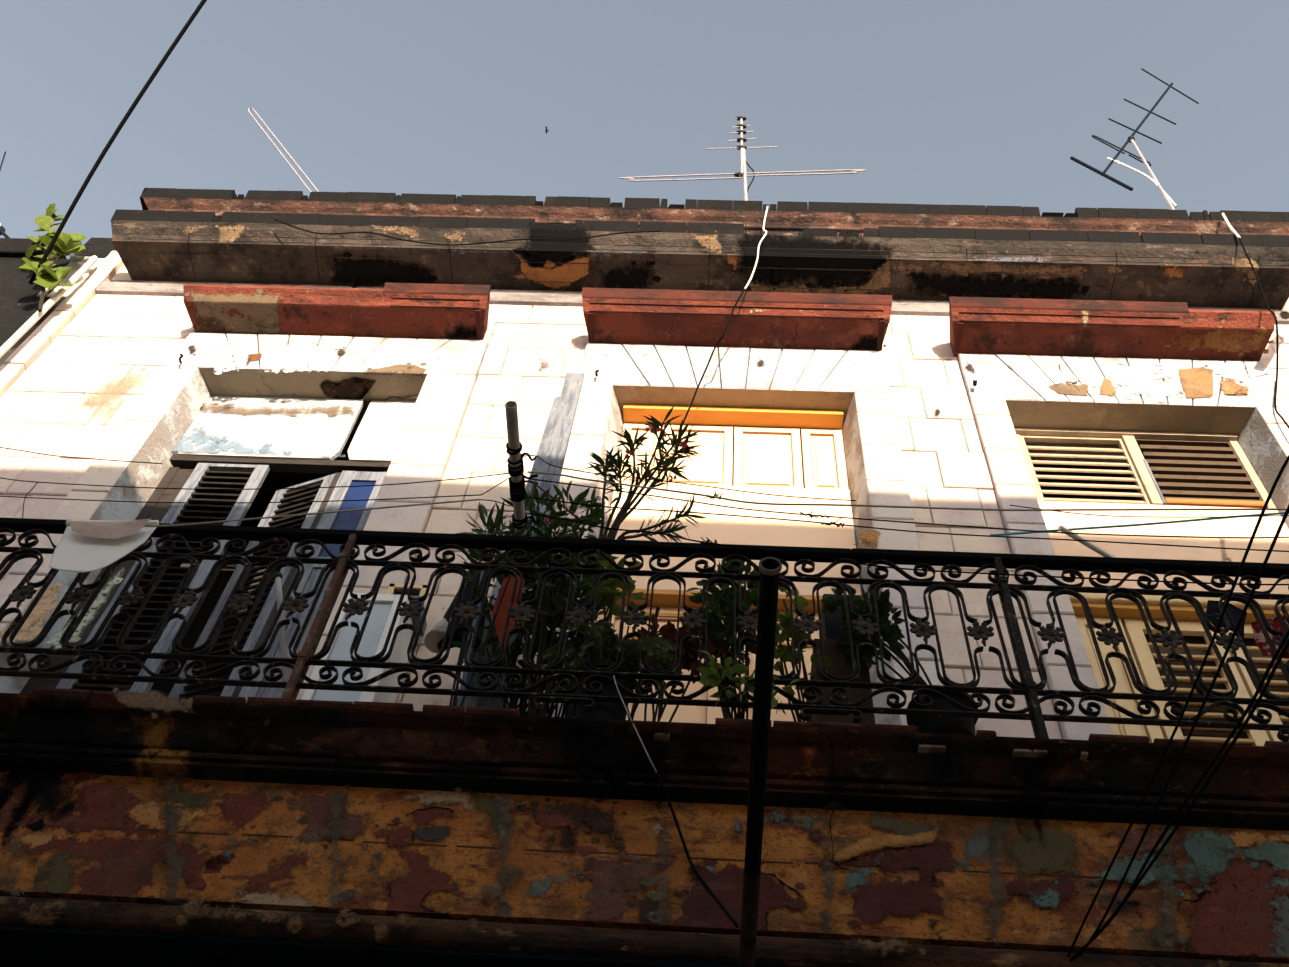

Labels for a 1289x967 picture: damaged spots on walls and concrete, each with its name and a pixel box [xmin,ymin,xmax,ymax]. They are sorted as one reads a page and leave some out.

damp [328,222,661,289]
flaking render [515,256,590,289]
damp [736,233,892,294]
damp [907,250,1090,300]
flaking render [183,288,427,416]
peeling [1048,320,1273,402]
damp [0,695,106,849]
damp [317,724,502,765]
peeling [0,775,474,943]
peeling [645,859,744,935]
peeling [818,811,973,958]
peeling [1175,831,1289,967]